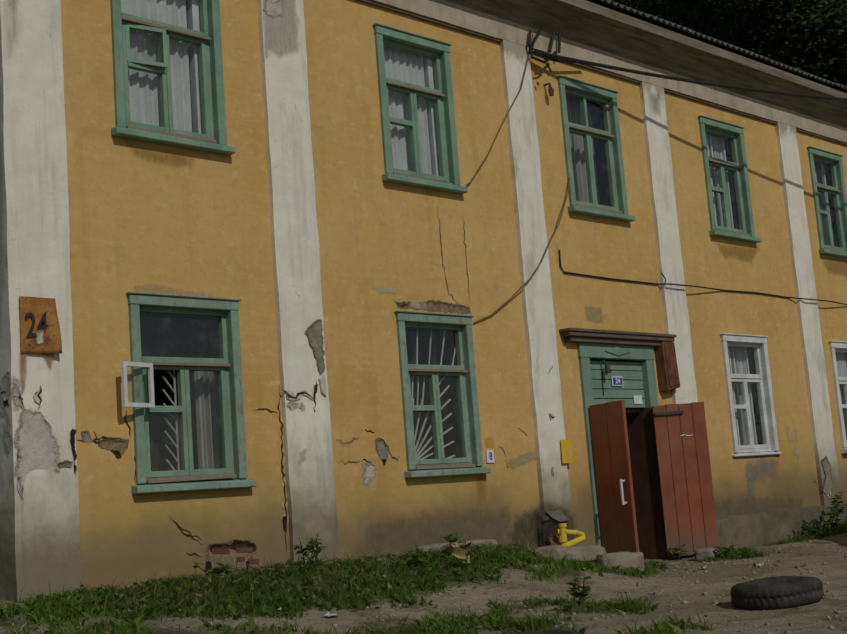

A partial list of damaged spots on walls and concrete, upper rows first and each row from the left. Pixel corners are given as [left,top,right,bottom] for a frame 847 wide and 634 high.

crack [437,216,470,306]
spalling [374,286,471,314]
spalling [305,319,327,397]
peeling [0,371,129,500]
crack [257,379,317,549]
crack [336,429,375,465]
spalling [362,438,390,486]
crack [171,518,204,557]
spalling [205,539,259,572]